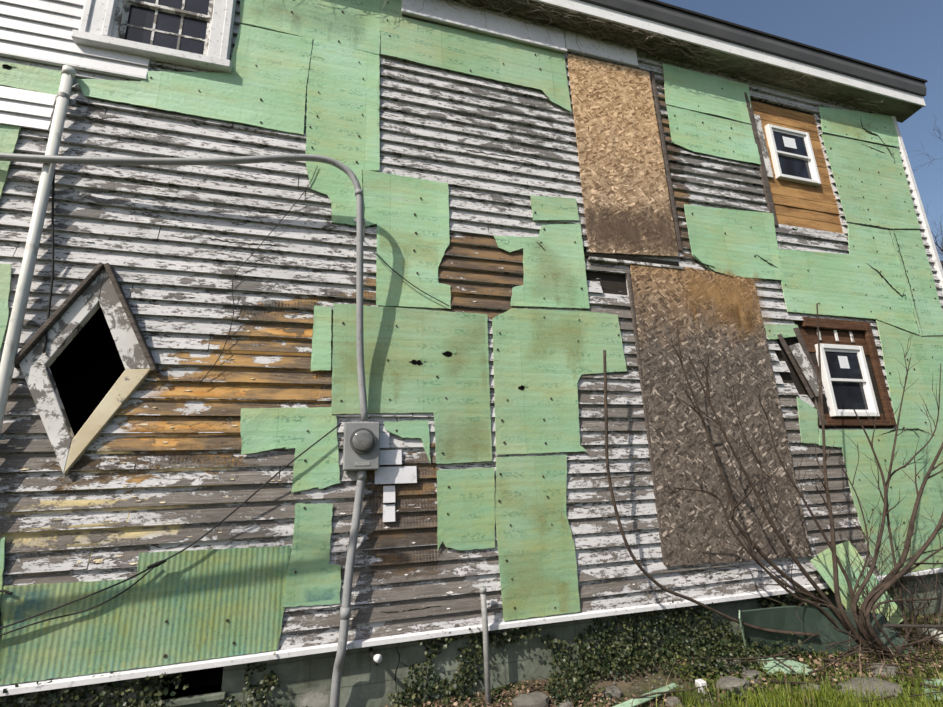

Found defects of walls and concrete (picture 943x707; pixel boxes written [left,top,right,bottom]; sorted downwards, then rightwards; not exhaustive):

peeling [381,65,580,187]
peeling [438,186,524,319]
peeling [584,259,631,279]
peeling [652,78,768,265]
peeling [0,104,503,647]
peeling [566,291,761,613]